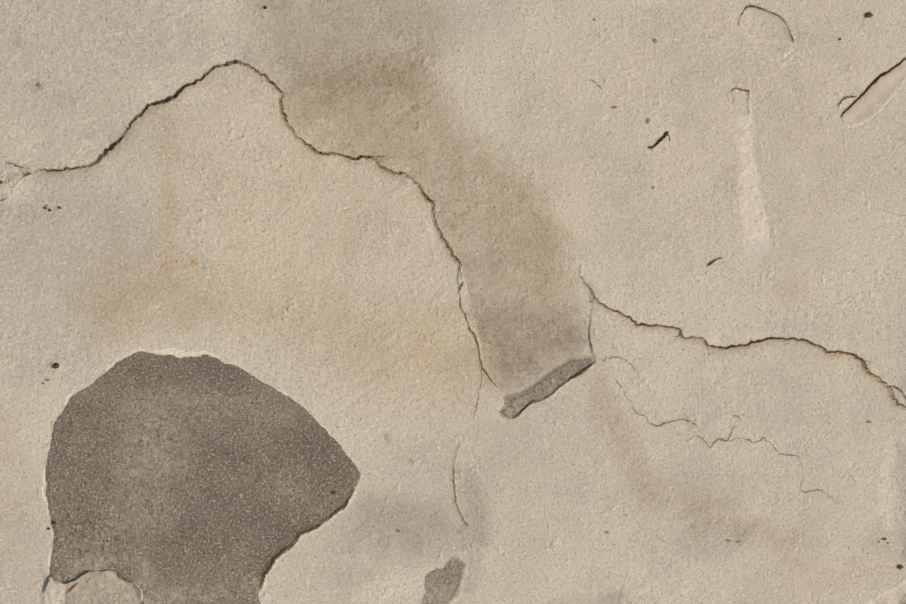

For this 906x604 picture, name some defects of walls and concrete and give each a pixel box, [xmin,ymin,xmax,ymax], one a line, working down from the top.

crack [738,5,794,43]
spalling [838,58,906,125]
crack [6,60,498,418]
flaking render [501,358,595,418]
crack [579,276,906,505]
flaking render [41,346,361,604]
crack [453,444,468,527]
flaking render [422,557,463,604]
flaking render [865,580,906,604]